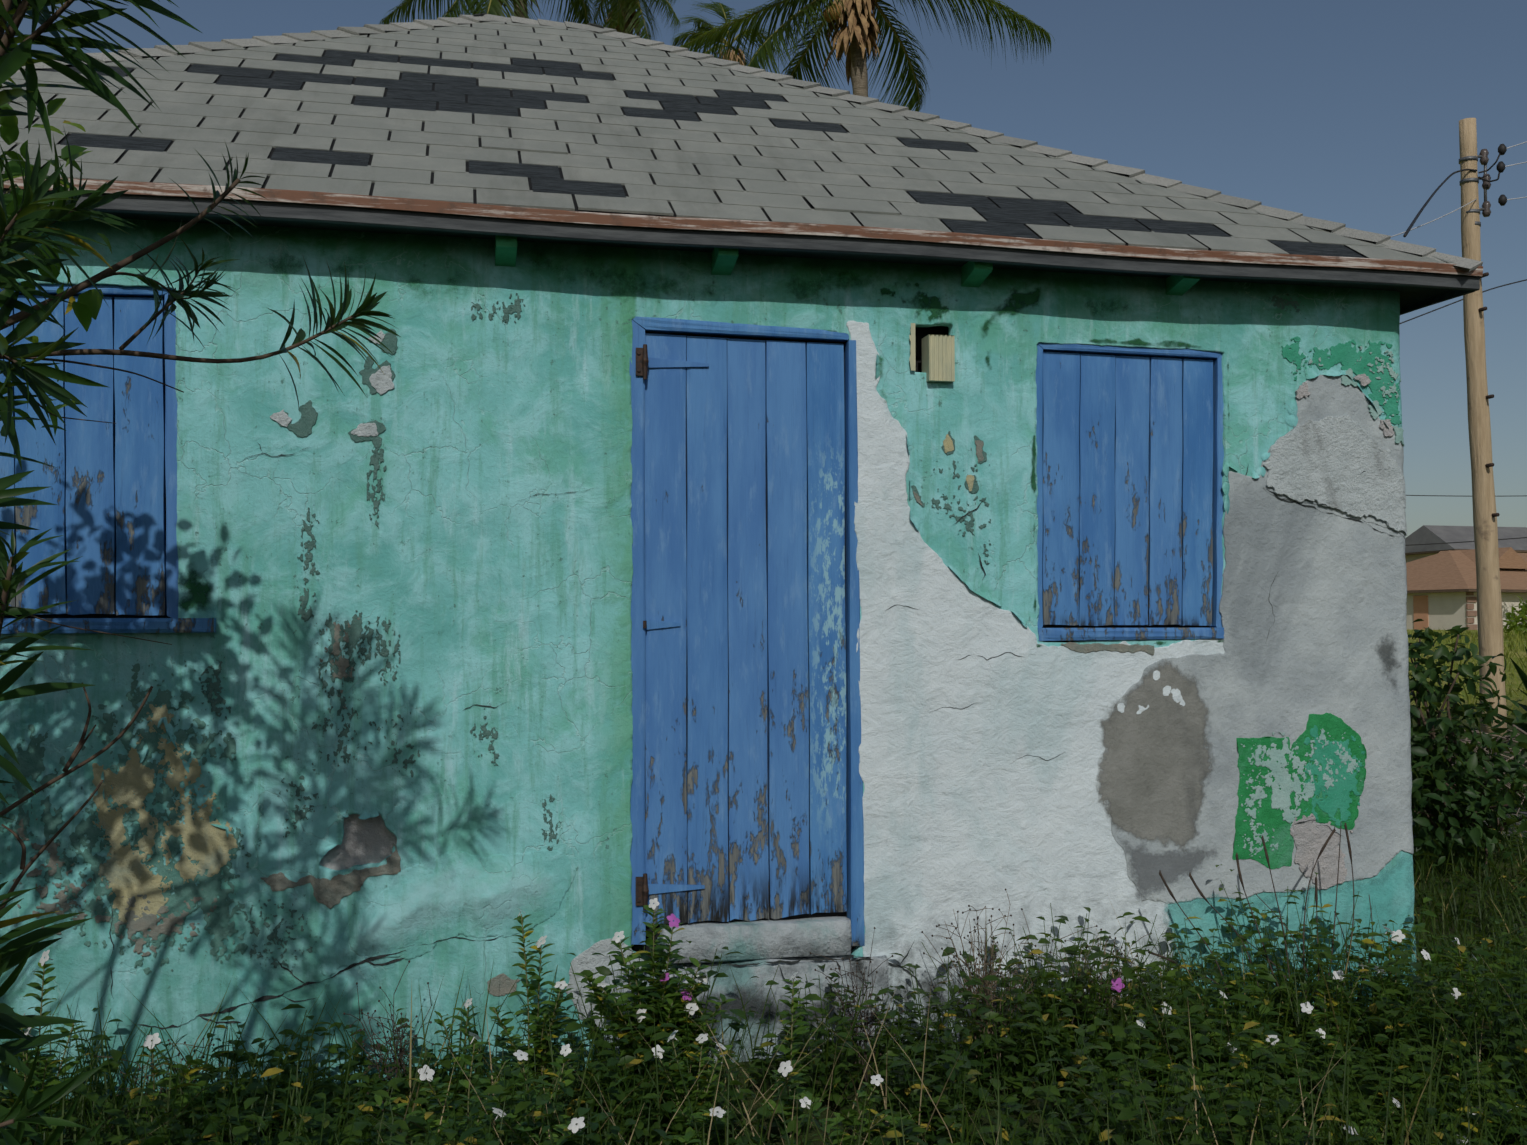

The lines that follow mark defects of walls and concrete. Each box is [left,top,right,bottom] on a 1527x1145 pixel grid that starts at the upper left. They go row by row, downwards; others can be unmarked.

spalling [270,400,318,437]
spalling [348,420,386,529]
spalling [359,328,398,395]
peeling [0,655,401,980]
peeling [277,507,421,838]
peeling [846,321,1414,1046]
leakage [1098,663,1214,897]
crack [109,907,503,1030]